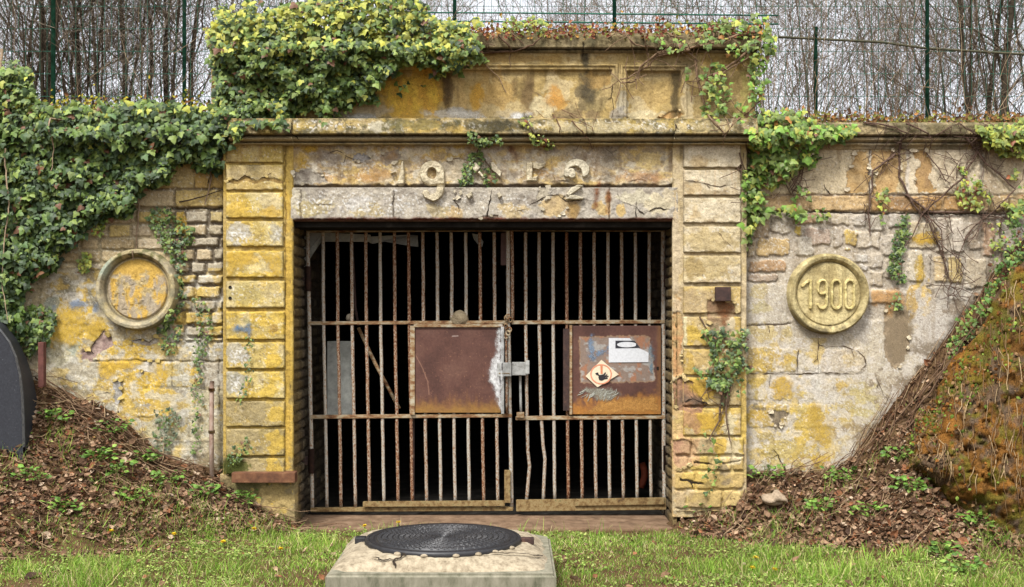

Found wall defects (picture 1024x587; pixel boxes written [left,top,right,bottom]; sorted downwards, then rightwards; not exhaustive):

leakage [580,53,595,101]
leakage [423,73,532,132]
peeling [844,148,937,195]
spalling [82,330,113,362]
leakage [886,309,912,362]